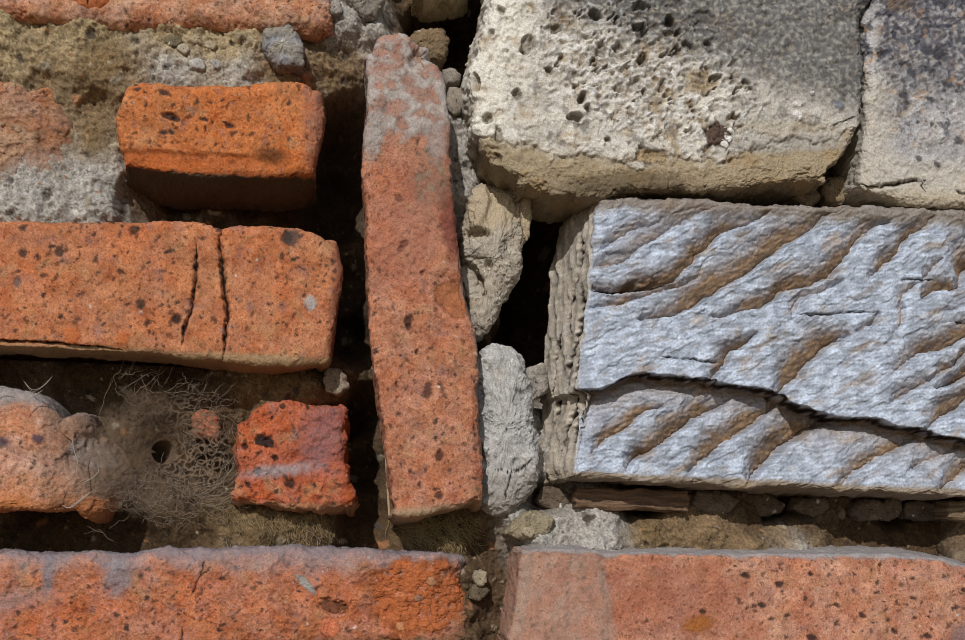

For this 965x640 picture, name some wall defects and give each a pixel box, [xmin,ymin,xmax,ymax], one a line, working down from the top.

crack [181,232,229,351]
crack [552,239,965,451]